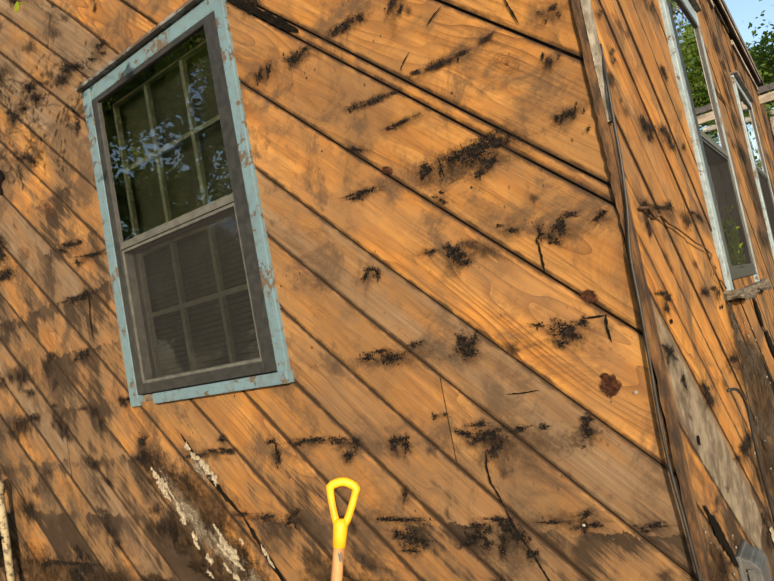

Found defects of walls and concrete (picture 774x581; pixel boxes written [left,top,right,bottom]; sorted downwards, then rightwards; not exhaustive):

crack [537,240,545,273]
peeling [150,467,245,581]
peeling [184,441,219,486]
water stain [148,455,263,581]
crack [485,453,551,581]
water stain [734,337,774,492]